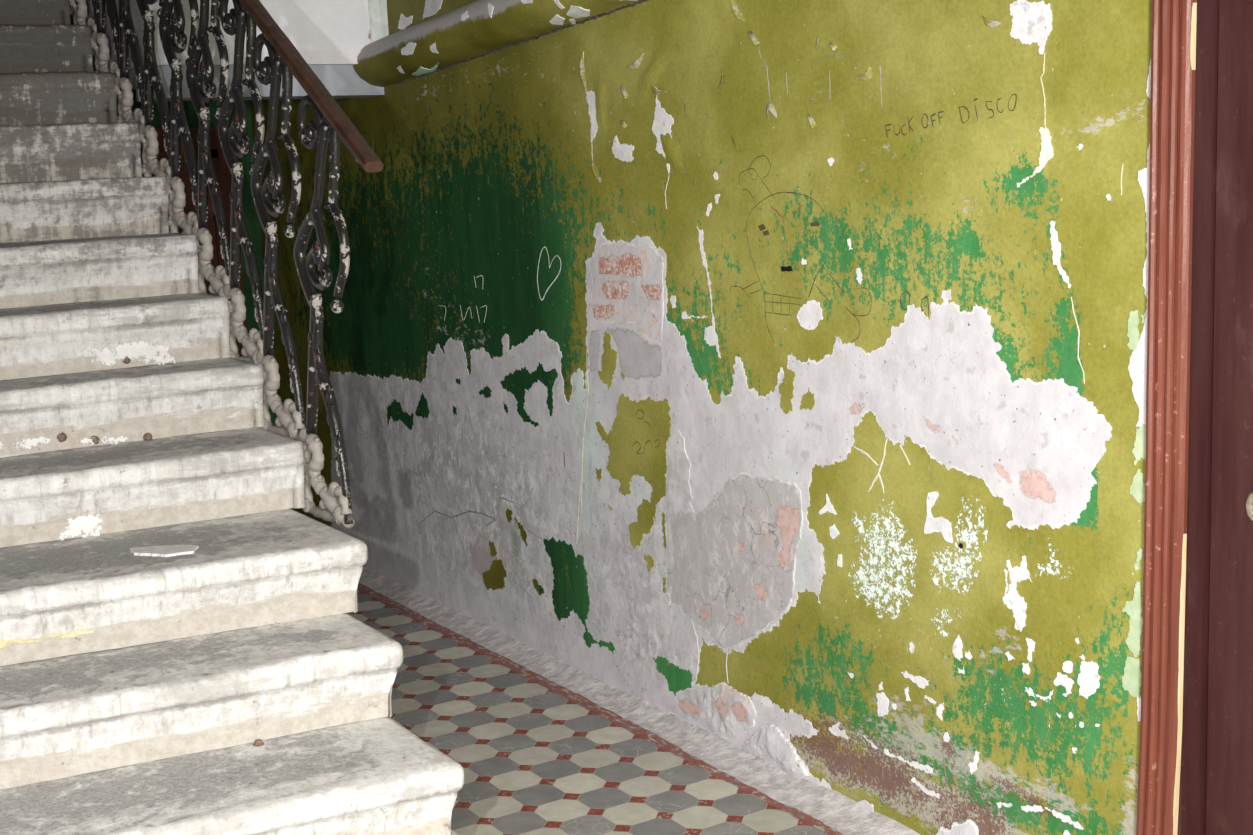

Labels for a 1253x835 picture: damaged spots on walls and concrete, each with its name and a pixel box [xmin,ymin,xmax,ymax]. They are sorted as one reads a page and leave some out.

peeling [397,0,443,76]
peeling [549,0,590,25]
peeling [730,0,760,46]
peeling [982,0,1053,55]
peeling [580,51,598,142]
crack [1039,53,1047,128]
crack [1071,297,1085,384]
peeling [329,171,1112,789]
crack [854,438,910,493]
spalling [936,819,979,835]
peeling [996,802,1084,835]